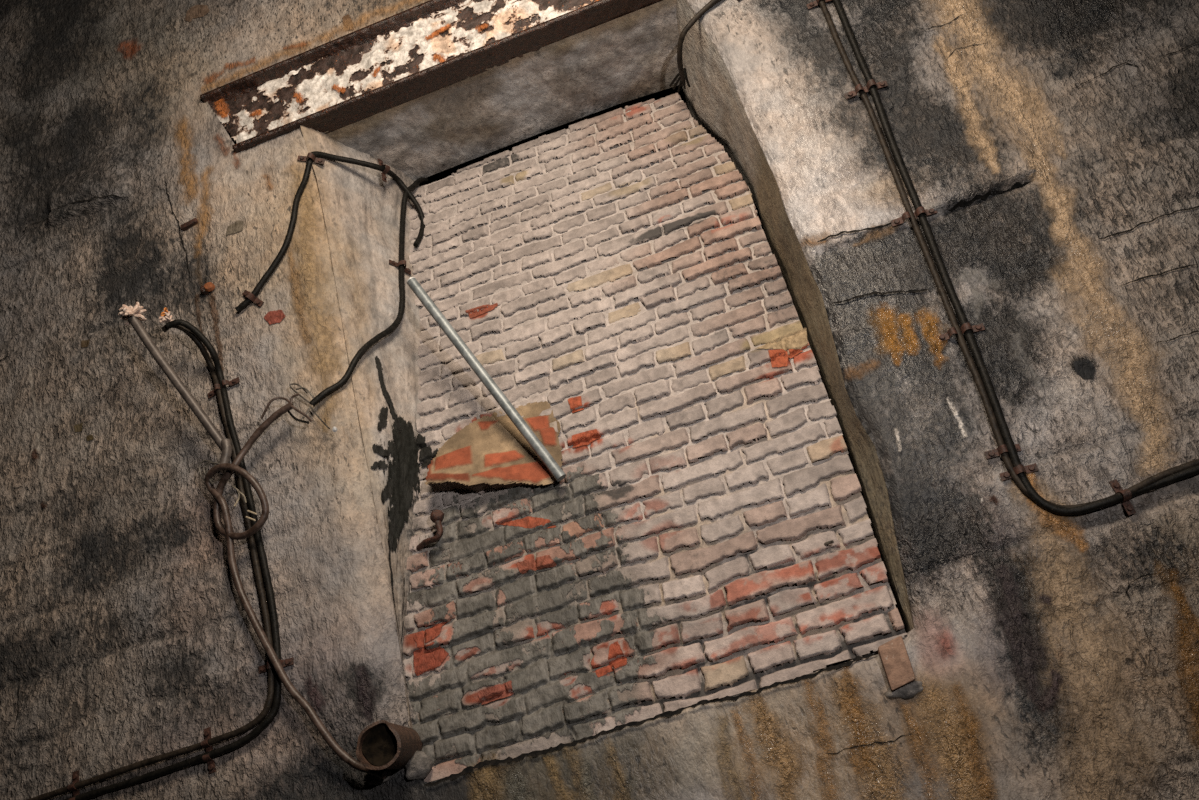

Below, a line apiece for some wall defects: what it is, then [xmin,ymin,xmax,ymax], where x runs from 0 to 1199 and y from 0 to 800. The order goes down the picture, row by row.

rust [202,0,415,118]
rust [425,24,450,40]
crack [817,220,907,242]
crack [949,180,1033,211]
damp [935,0,1166,469]
crack [1100,205,1199,239]
crack [1121,264,1199,291]
spalling [568,396,584,413]
peeling [406,401,666,767]
damp [1014,473,1130,800]
rust [718,695,801,800]
rust [833,678,905,800]